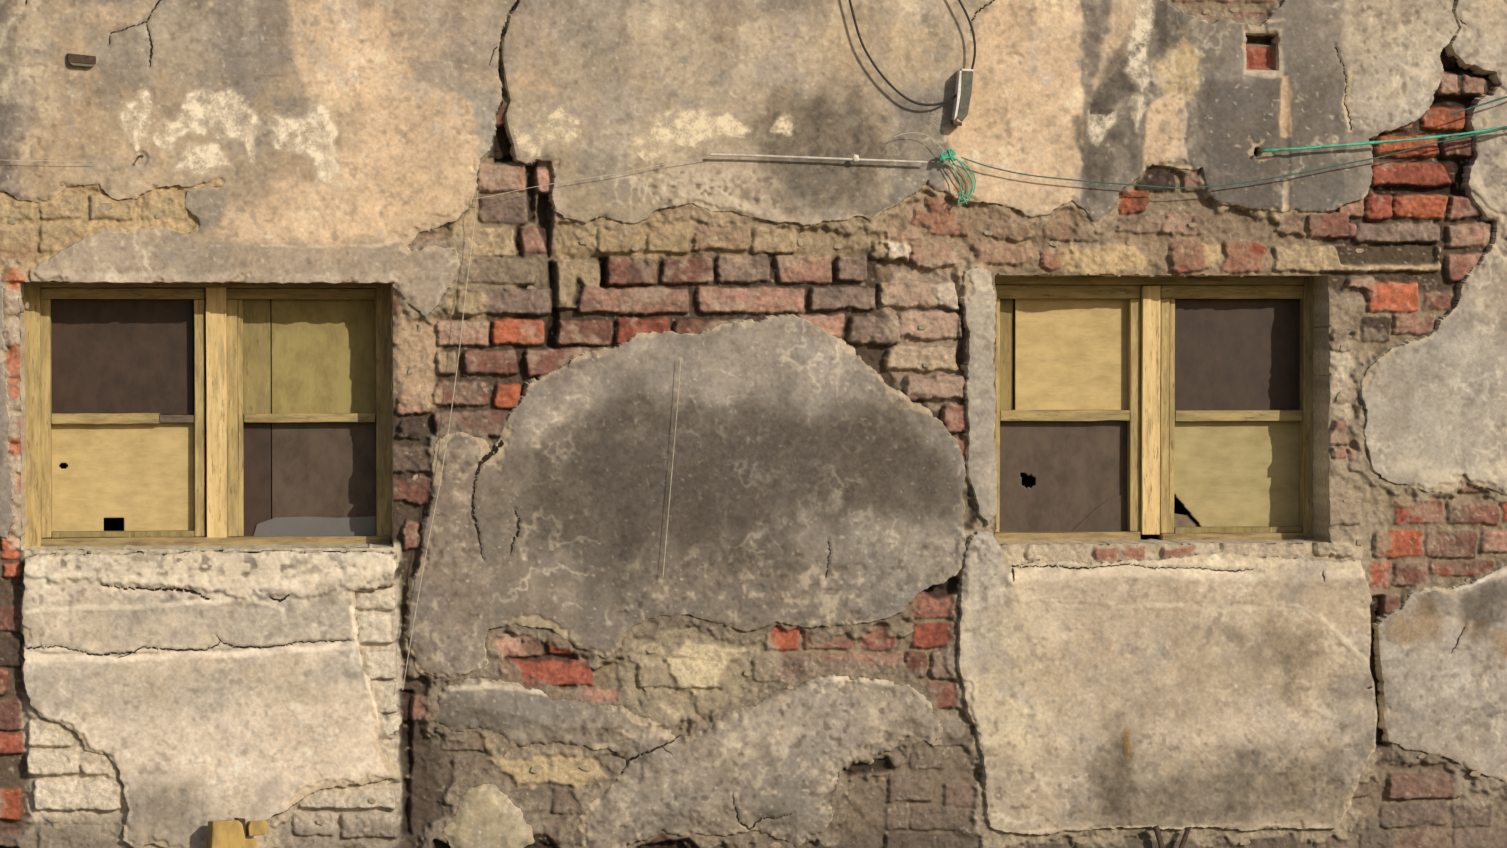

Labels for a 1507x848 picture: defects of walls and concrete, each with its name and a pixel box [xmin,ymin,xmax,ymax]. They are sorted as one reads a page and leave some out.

crack [108,0,161,69]
efflorescence [120,89,344,189]
crack [489,7,515,159]
water stain [1088,0,1178,174]
flaking render [0,178,224,848]
spalling [144,547,240,556]
crack [471,440,520,559]
flaking render [262,0,1159,848]
flaking render [886,0,1507,848]
crack [1367,604,1384,742]